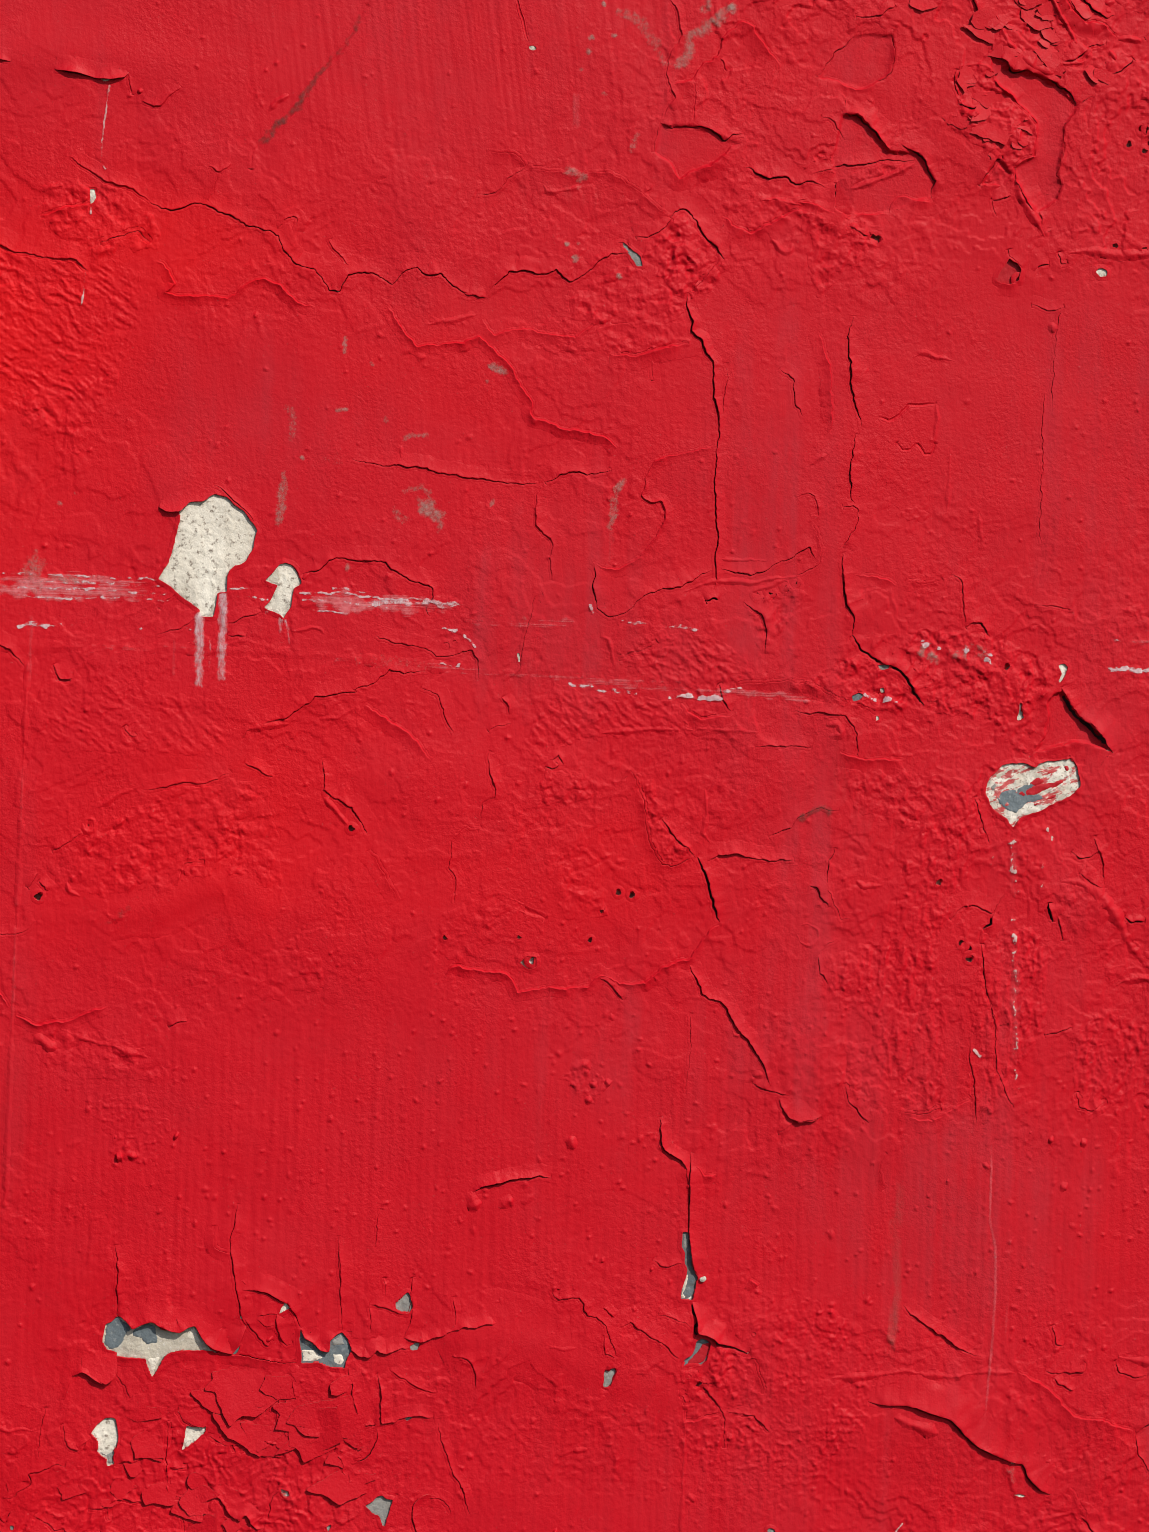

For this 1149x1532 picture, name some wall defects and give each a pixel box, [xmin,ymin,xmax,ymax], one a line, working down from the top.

spalling [807,0,1149,239]
damp [1,572,168,601]
peeling [154,480,306,623]
damp [220,587,268,657]
damp [299,587,460,614]
crack [97,148,1002,907]
crack [621,677,903,986]
spalling [806,628,1149,1134]
crack [933,875,1026,1125]
spalling [0,1236,503,1532]
spalling [548,1114,1101,1532]
crack [901,1297,984,1360]